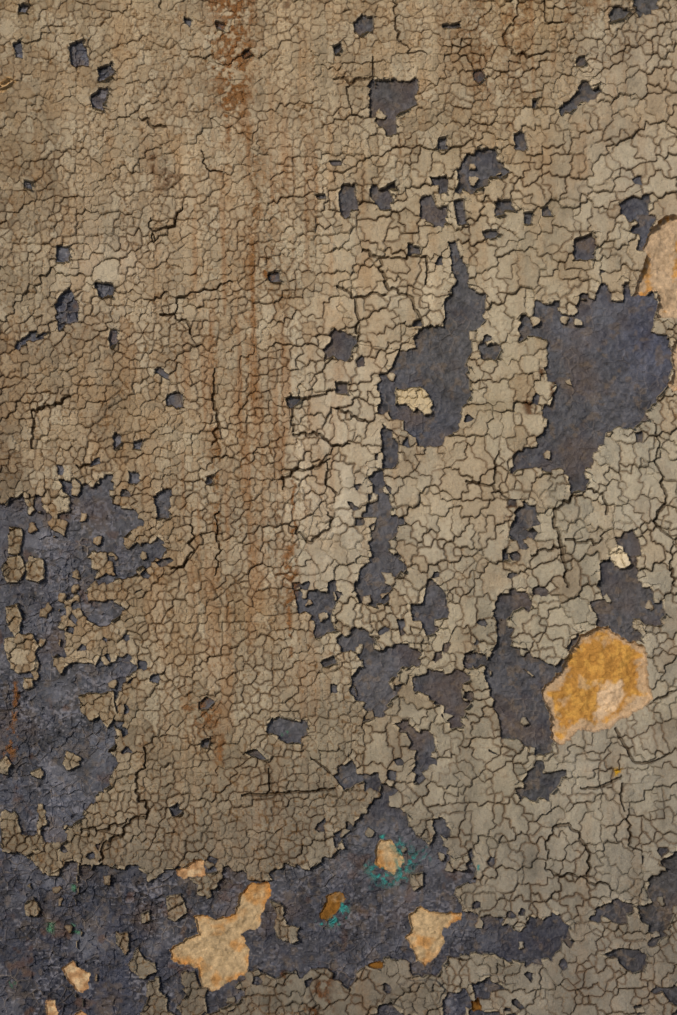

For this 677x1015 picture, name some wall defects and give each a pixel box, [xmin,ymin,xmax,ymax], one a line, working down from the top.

peeling [67,36,117,115]
rust [210,0,254,141]
peeling [363,79,419,140]
peeling [418,145,513,227]
crack [336,248,429,342]
peeling [508,177,677,496]
crack [280,389,369,545]
peeling [348,239,504,612]
crack [530,487,609,588]
crack [652,423,677,586]
crack [81,743,151,862]
peeling [0,458,677,1015]